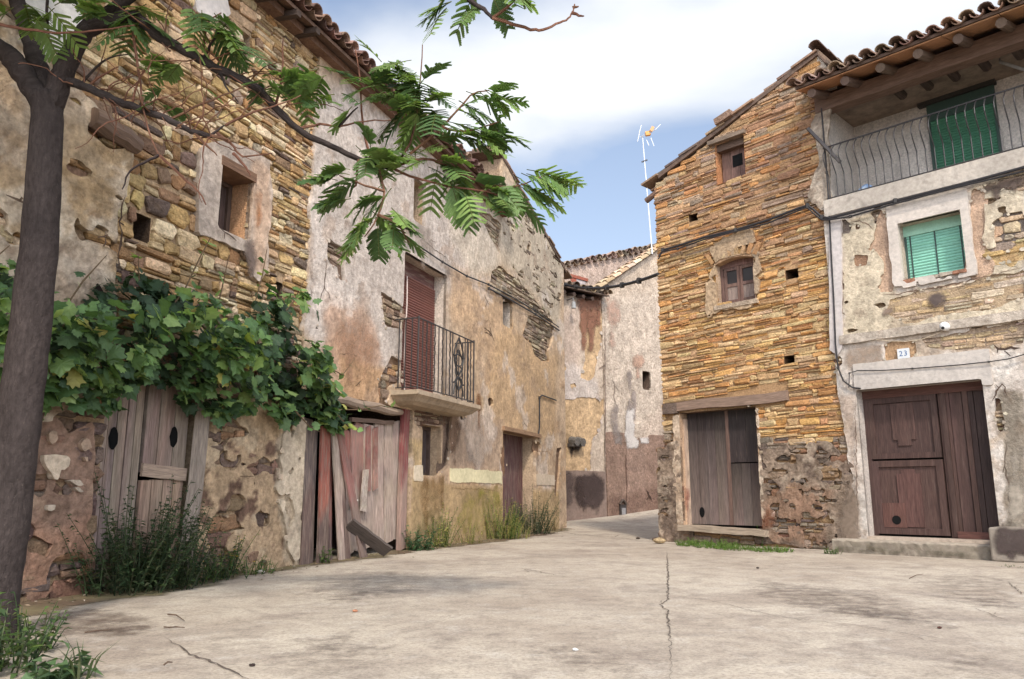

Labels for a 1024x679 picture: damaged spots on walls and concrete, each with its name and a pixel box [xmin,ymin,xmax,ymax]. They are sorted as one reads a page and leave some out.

flaking render [843,170,1024,324]
flaking render [489,266,555,363]
flaking render [40,431,92,492]
flaking render [273,418,307,561]
damp [566,473,604,509]